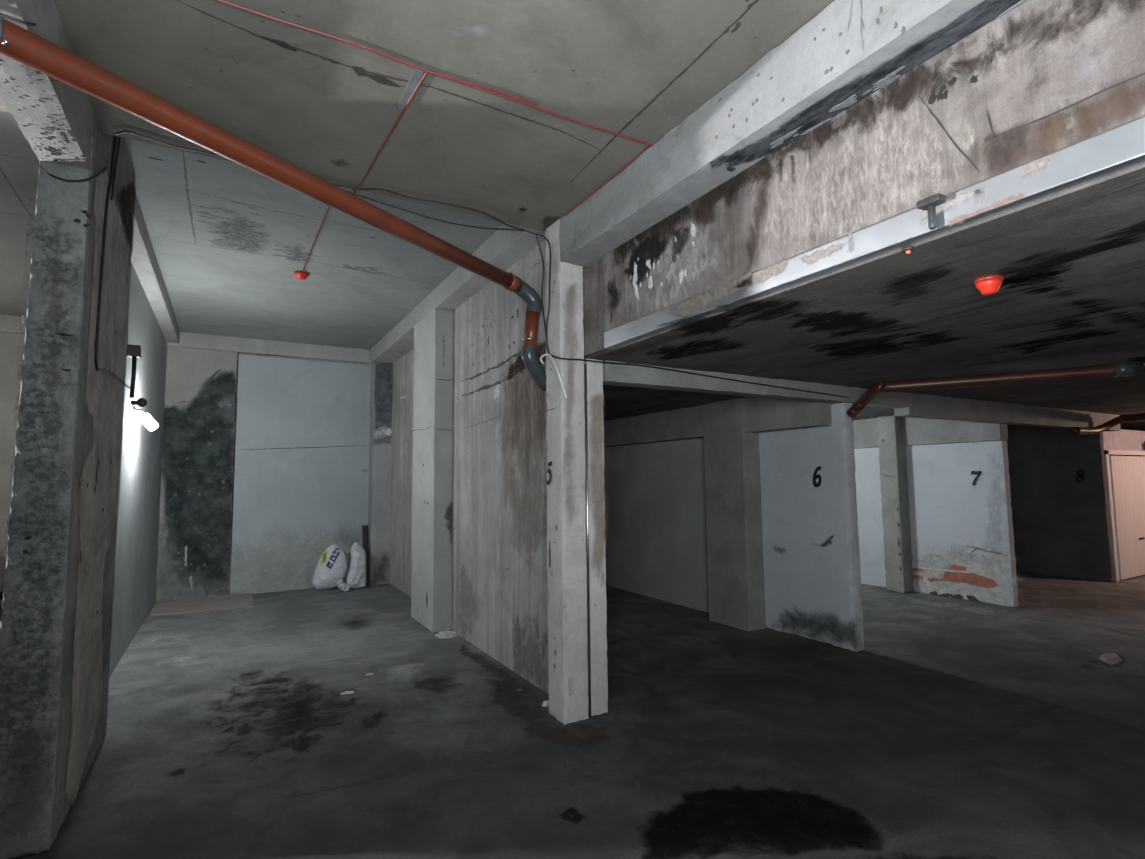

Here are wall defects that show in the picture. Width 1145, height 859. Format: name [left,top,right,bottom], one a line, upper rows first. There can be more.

leakage [953,0,1138,75]
crack [918,72,1145,172]
leakage [613,64,947,285]
leakage [608,282,618,317]
peeling [630,258,662,301]
leakage [649,299,970,360]
leakage [889,269,947,304]
leakage [999,221,1145,354]
crack [439,342,546,397]
leakage [156,369,237,599]
peeling [897,507,1013,602]